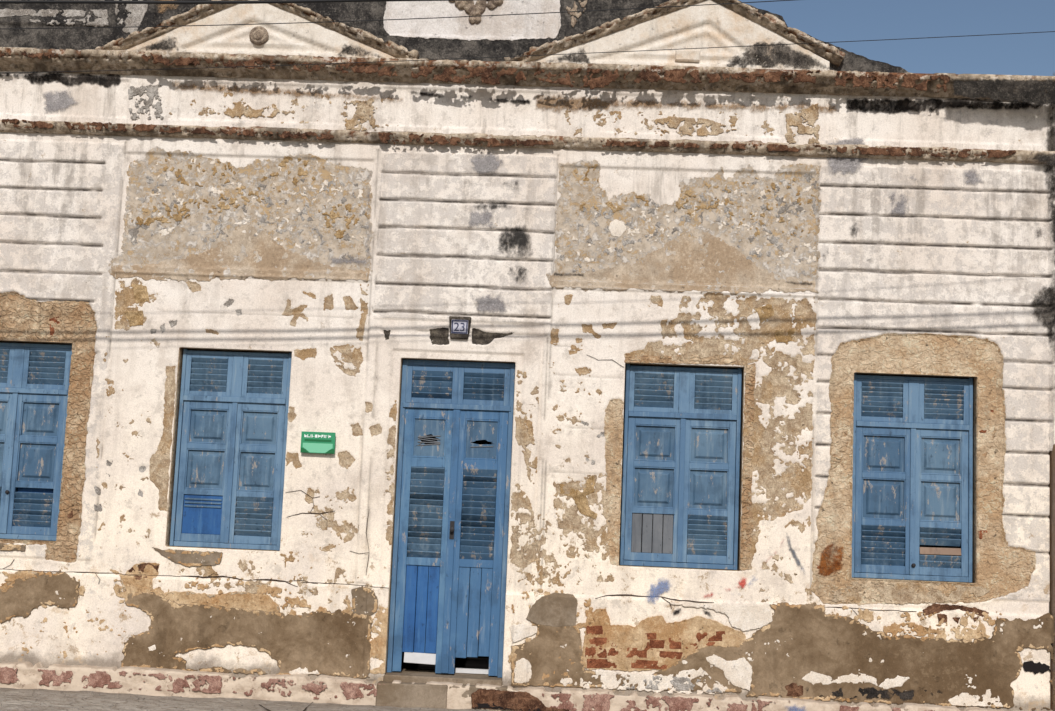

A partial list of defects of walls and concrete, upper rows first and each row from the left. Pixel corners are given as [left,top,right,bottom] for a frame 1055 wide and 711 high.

peeling [2,119,135,132]
leakage [0,72,164,120]
leakage [174,82,393,131]
leakage [471,154,502,175]
flaking render [593,109,777,151]
peeling [908,147,1016,158]
leakage [491,74,1055,347]
leakage [468,203,530,281]
leakage [476,295,505,312]
flaking render [0,146,385,700]
flaking render [508,160,1036,711]
spalling [991,644,1055,710]